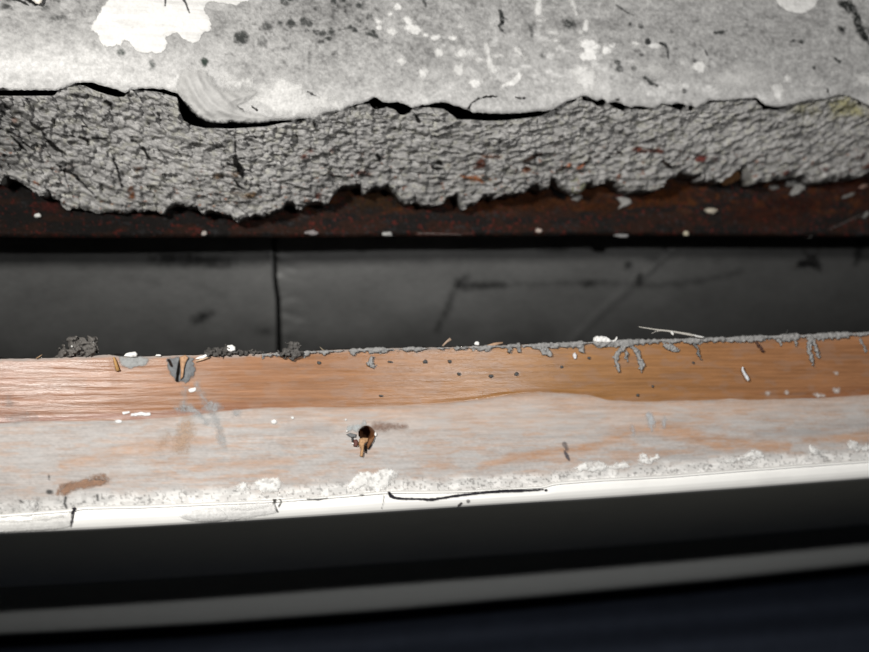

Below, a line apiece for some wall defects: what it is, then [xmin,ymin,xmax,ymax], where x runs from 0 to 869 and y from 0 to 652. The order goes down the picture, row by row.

crack [0,87,57,96]
crack [582,96,643,110]
crack [753,98,771,110]
crack [80,82,543,189]
crack [6,121,123,195]
flaking render [0,83,869,224]
rust [460,156,486,183]
crack [556,150,623,172]
rust [720,171,741,186]
rust [481,186,618,213]